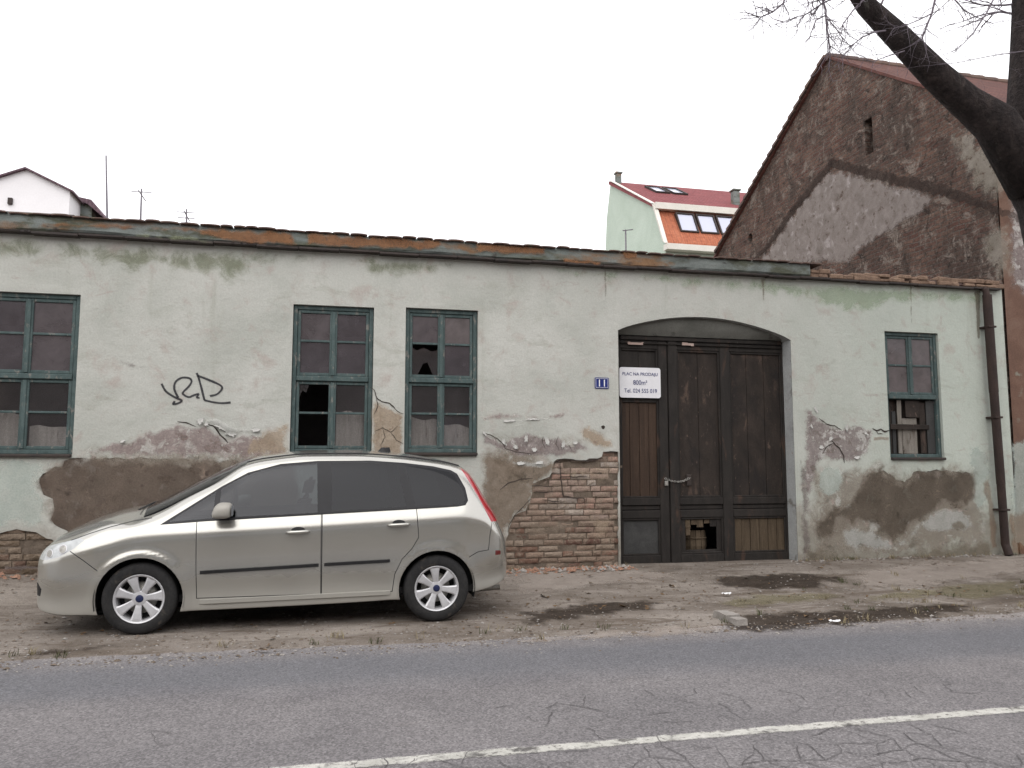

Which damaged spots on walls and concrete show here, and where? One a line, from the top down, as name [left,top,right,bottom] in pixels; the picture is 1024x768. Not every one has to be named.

flaking render [952,134,1001,191]
flaking render [986,231,1011,276]
crack [177,421,228,443]
crack [370,387,403,444]
peeling [373,404,402,453]
crack [820,419,845,463]
flaking render [39,417,287,532]
spalling [483,429,622,570]
peeling [805,406,983,554]